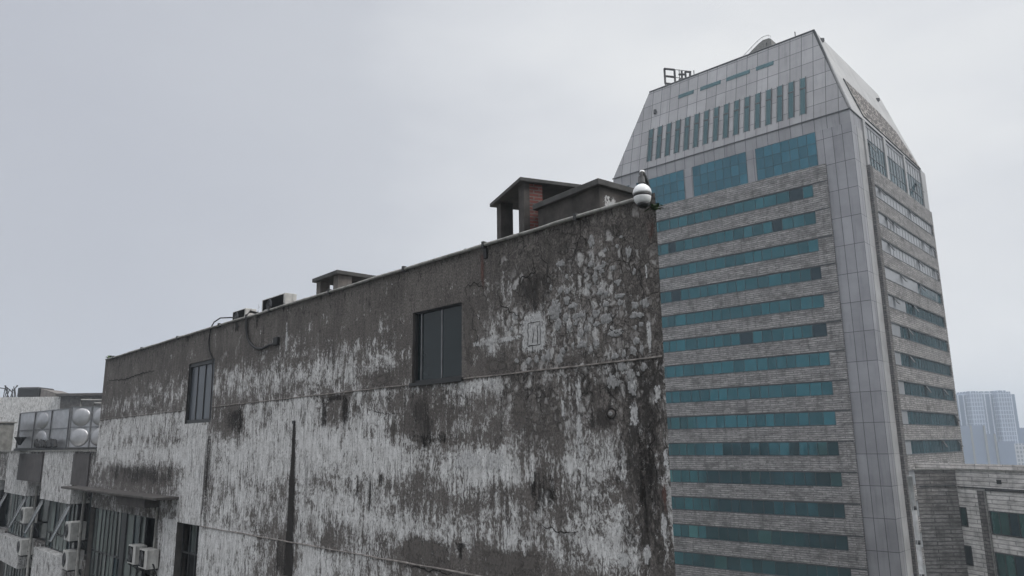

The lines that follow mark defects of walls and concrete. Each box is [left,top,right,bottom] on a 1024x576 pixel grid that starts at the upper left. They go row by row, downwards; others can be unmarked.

crack [464,223,586,353]
peeling [473,234,651,425]
water stain [229,407,243,433]
water stain [321,395,350,428]
water stain [115,465,172,485]
water stain [201,436,211,526]
water stain [276,420,296,576]
water stain [531,472,554,513]